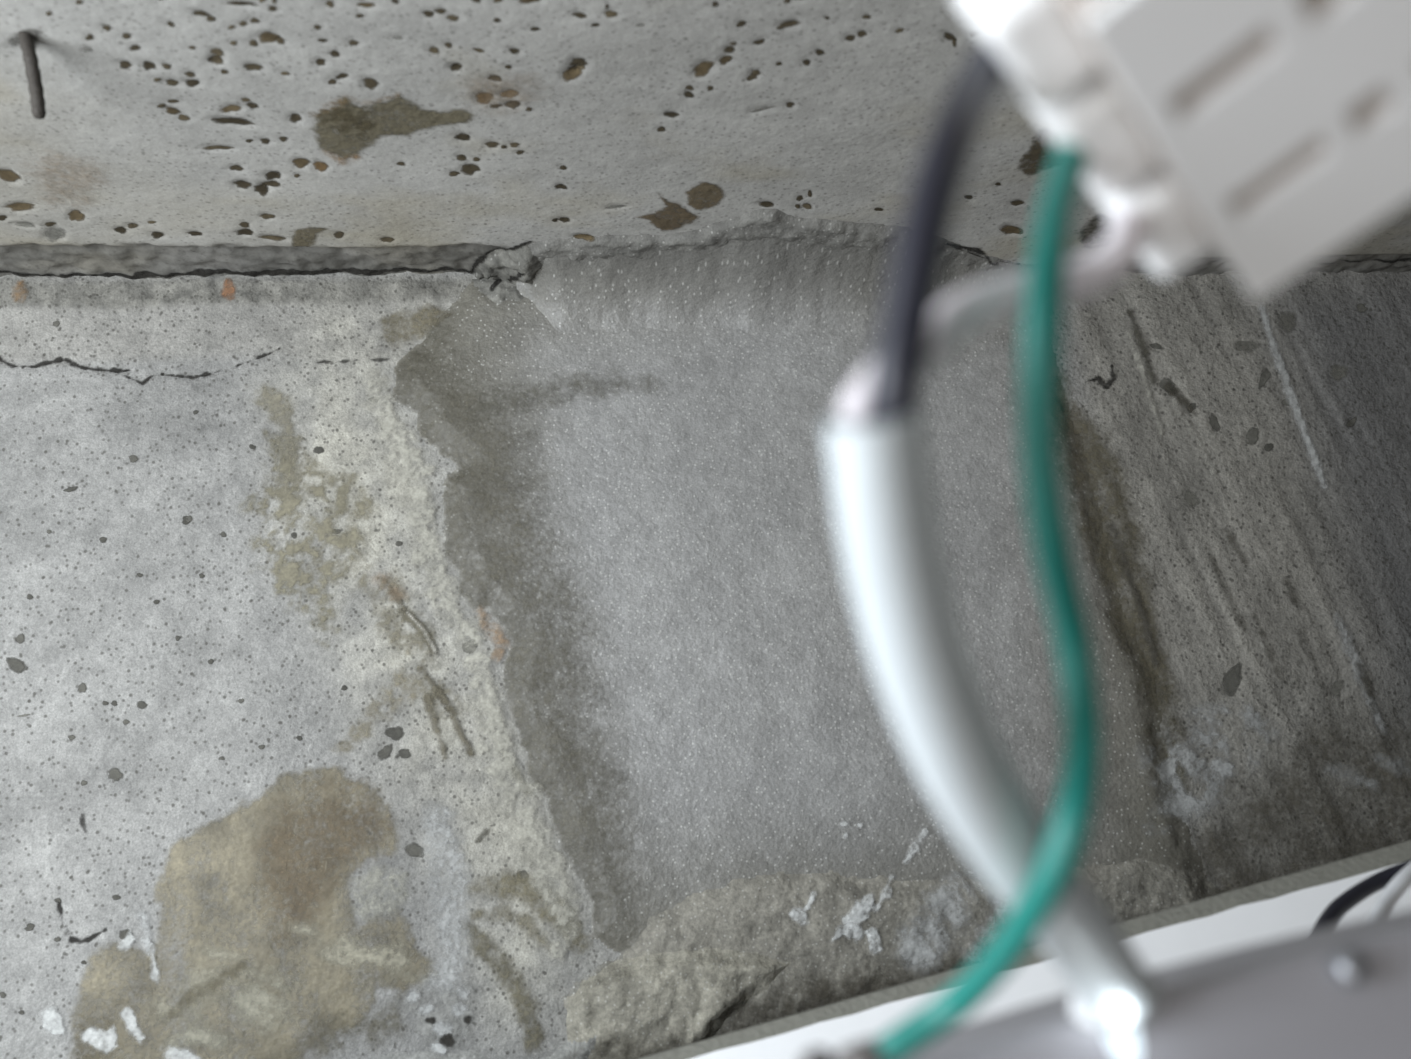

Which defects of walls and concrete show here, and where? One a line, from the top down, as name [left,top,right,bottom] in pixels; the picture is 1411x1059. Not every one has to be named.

crack [0,241,532,291]
crack [0,348,280,385]
crack [317,356,387,364]
leakage [73,767,439,1059]